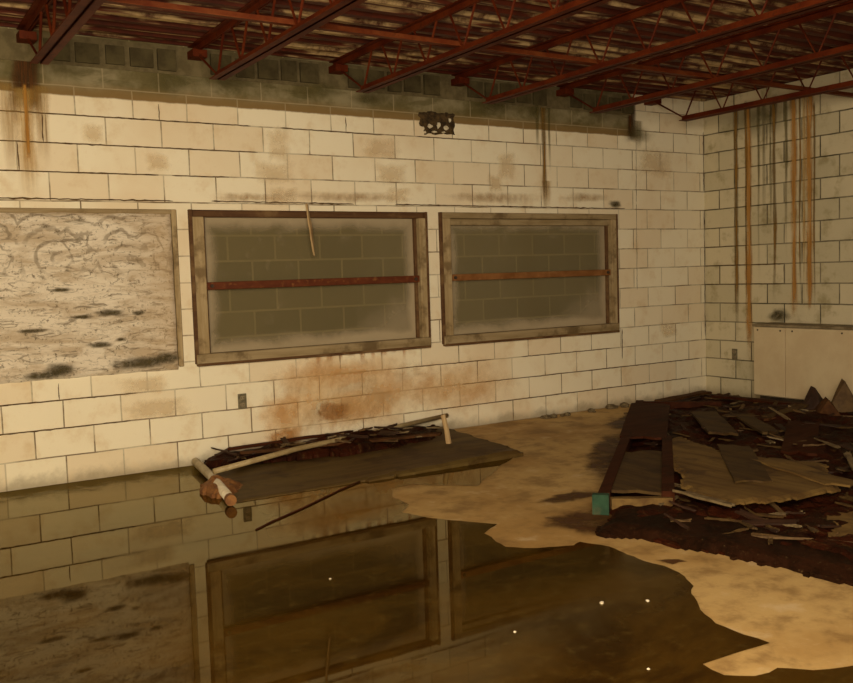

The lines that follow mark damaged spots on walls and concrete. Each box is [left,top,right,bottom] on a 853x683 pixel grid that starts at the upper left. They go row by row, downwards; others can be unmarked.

corrosion [13,60,39,161]
corrosion [734,109,752,335]
water stain [752,101,787,266]
corrosion [791,96,815,303]